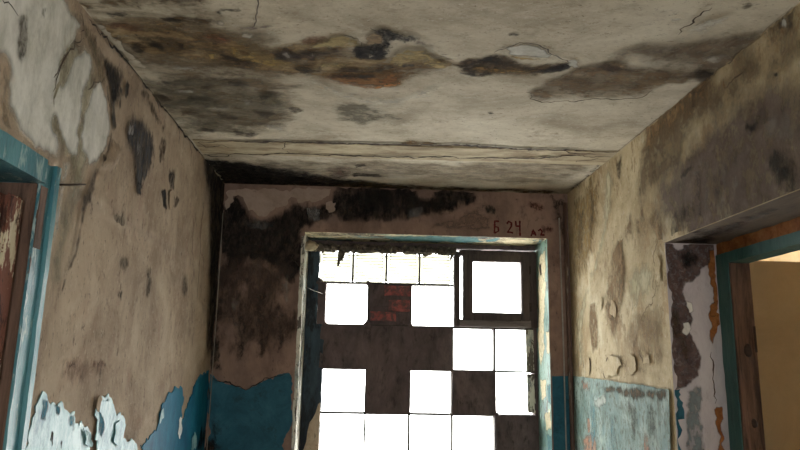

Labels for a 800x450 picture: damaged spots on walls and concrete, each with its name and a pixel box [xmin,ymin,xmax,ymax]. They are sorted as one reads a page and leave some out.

peeling [0,0,109,199]
crack [53,10,789,191]
peeling [494,42,578,68]
leakage [98,0,800,390]
peeling [26,370,293,450]
peeling [313,236,704,450]
flaking render [714,407,724,450]